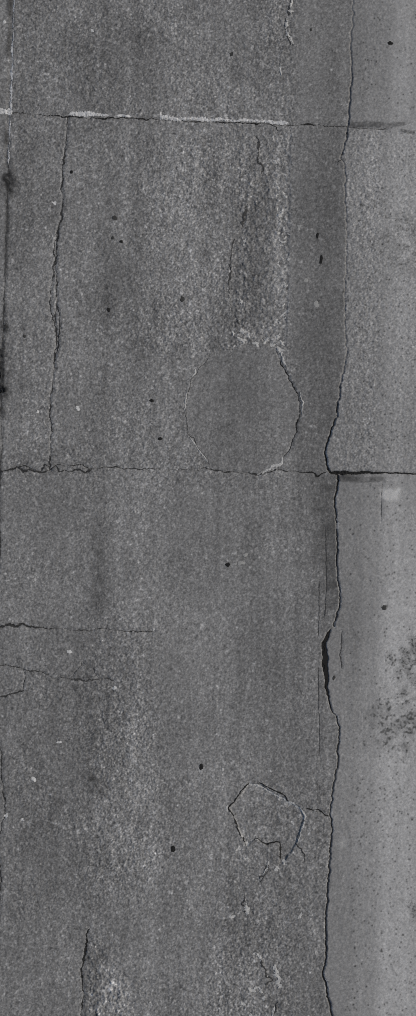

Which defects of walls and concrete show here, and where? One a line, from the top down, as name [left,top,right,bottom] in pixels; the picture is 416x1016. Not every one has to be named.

crack [0,112,388,486]
crack [0,623,154,633]
crack [0,662,113,697]
crack [178,339,342,1016]
crack [0,748,8,834]
crack [80,929,90,1015]